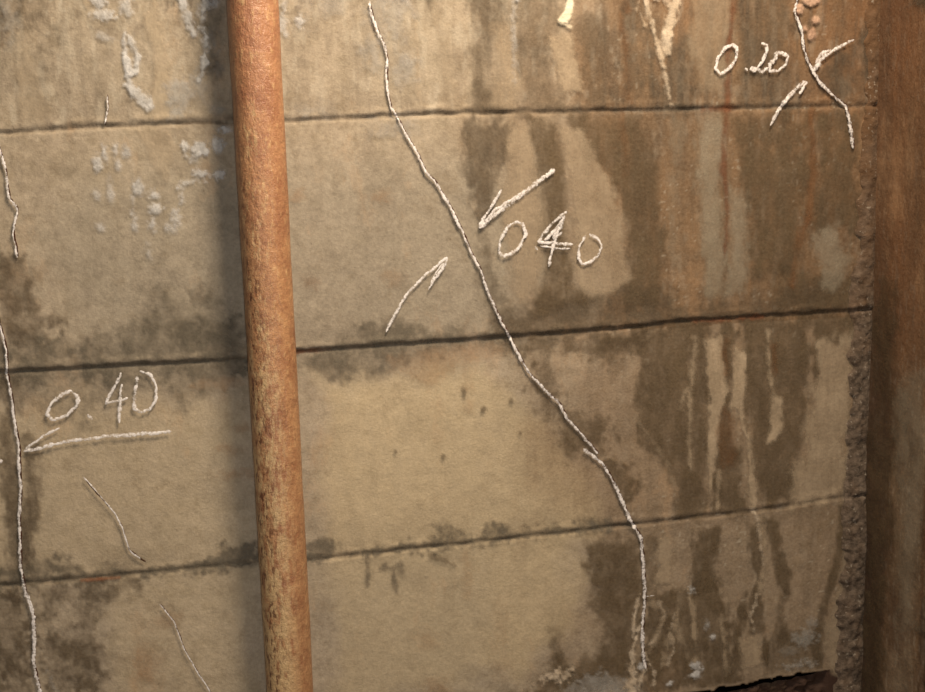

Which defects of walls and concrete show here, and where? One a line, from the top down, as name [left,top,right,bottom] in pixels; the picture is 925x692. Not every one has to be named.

leakage [122,0,189,121]
leakage [179,0,217,83]
crack [796,0,855,148]
crack [0,147,19,256]
leakage [462,0,859,516]
crack [369,1,648,667]
crack [0,320,41,688]
leakage [0,621,105,692]
leakage [0,431,115,607]
crack [86,481,146,562]
leakage [136,542,259,585]
leakage [538,518,789,692]